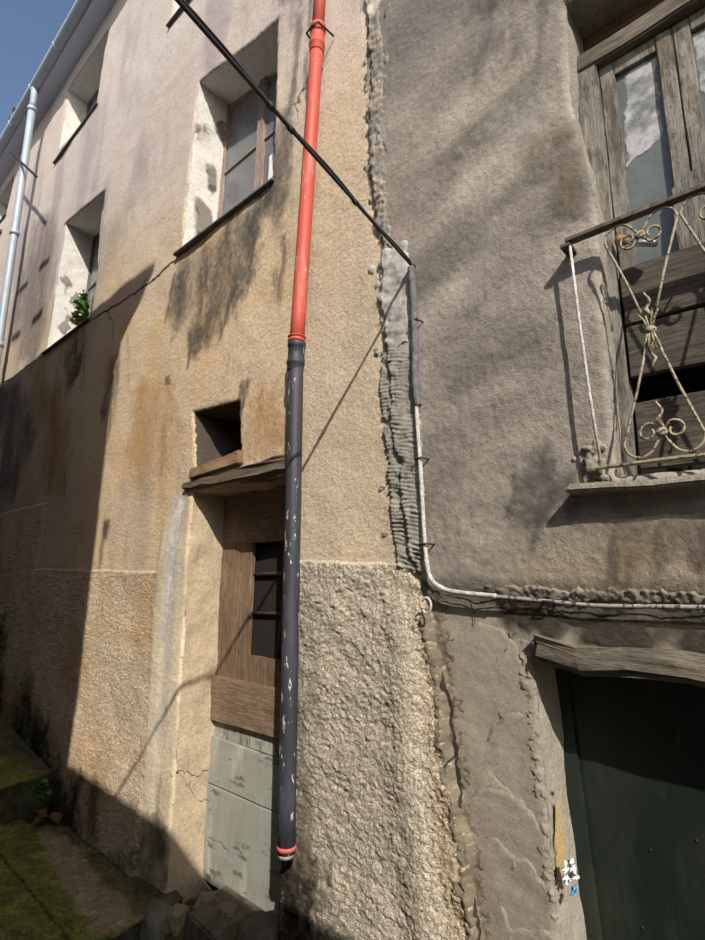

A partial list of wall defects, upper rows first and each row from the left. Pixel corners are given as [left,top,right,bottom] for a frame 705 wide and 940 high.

spalling [362,0,393,249]
crack [91,256,179,341]
damp [172,108,292,356]
damp [0,383,35,496]
damp [0,617,81,834]
crack [440,671,463,809]
damp [278,856,332,940]
crack [473,897,482,940]